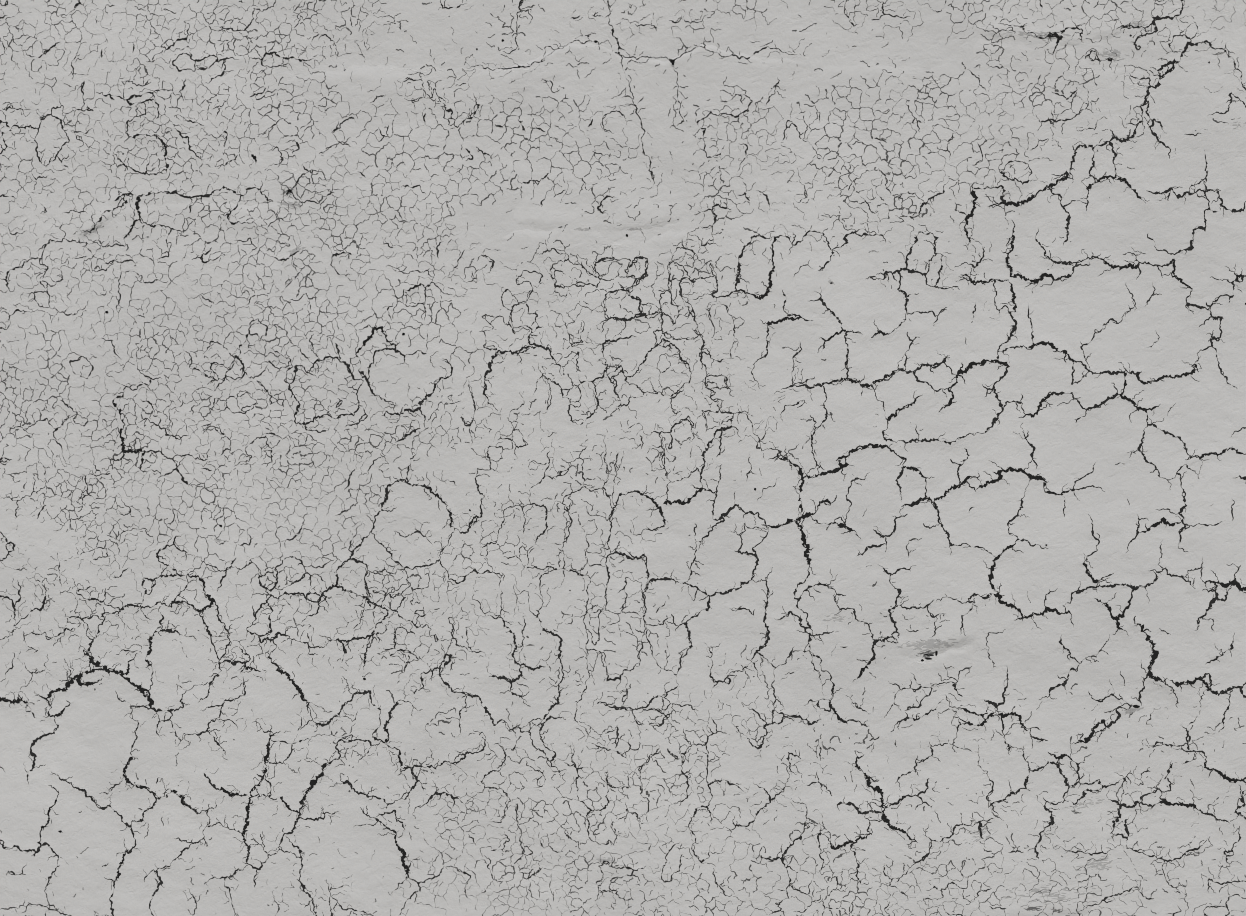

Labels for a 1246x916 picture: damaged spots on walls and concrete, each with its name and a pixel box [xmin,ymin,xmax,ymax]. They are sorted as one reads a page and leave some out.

crack [745,290,813,390]
crack [1207,633,1235,663]